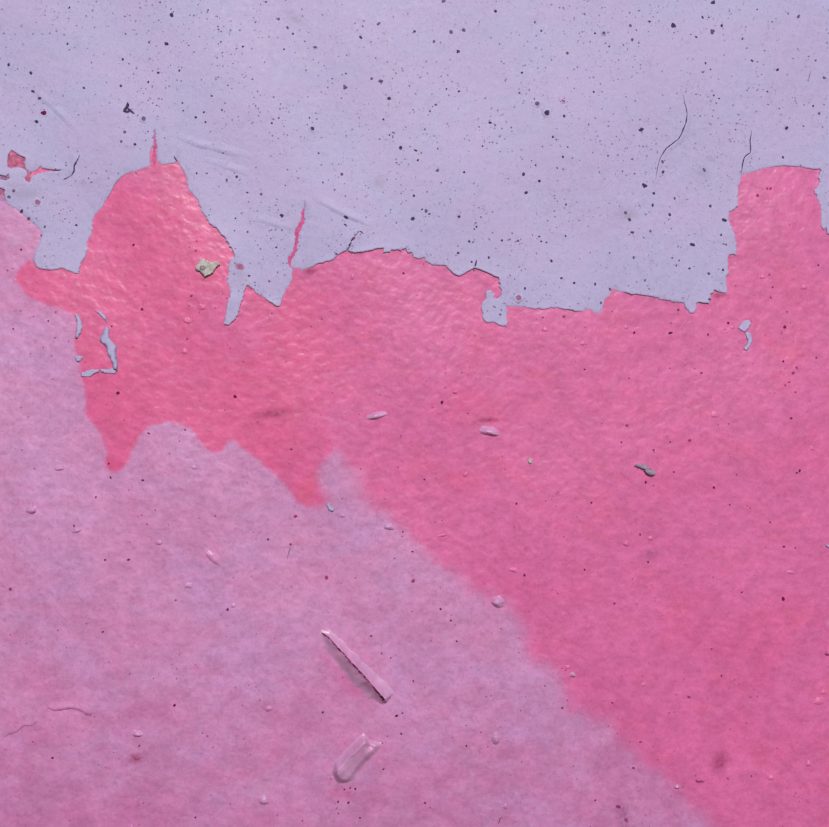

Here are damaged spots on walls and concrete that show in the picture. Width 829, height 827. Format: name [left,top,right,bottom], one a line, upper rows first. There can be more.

crack [656,94,692,181]
crack [741,130,757,175]
peeling [0,150,60,214]
peeling [195,259,220,277]
peeling [75,314,83,339]
peeling [100,326,118,371]
peeling [738,320,751,332]
peeling [635,463,656,475]